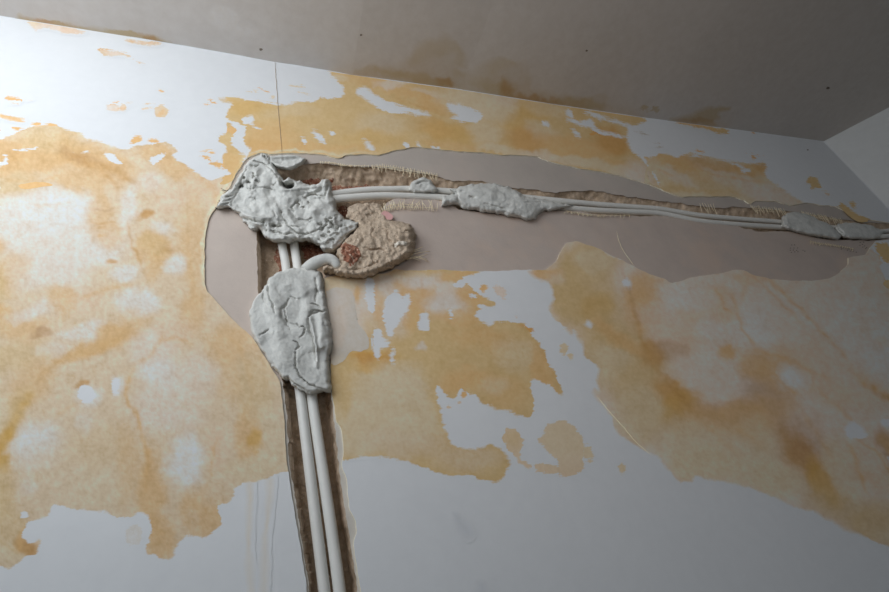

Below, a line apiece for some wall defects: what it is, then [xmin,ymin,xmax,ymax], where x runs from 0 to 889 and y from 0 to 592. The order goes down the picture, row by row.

leakage [100,87,171,120]
flaking render [301,244,325,260]
leakage [196,30,807,205]
flaking render [229,148,889,224]
flaking render [378,198,889,283]
leakage [0,111,289,592]
flaking render [204,208,309,592]
leakage [325,240,889,550]
flaking render [331,390,360,592]